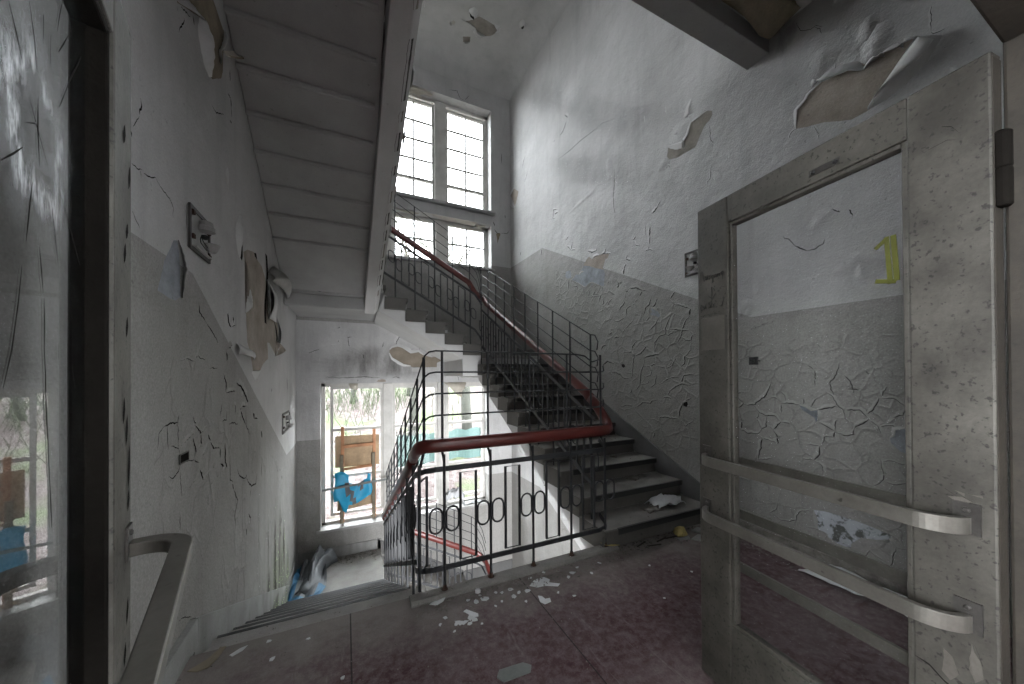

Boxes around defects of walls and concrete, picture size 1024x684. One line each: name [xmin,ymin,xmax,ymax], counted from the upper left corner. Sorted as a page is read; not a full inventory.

peeling [177,0,228,79]
peeling [450,7,501,44]
peeling [793,37,914,129]
peeling [667,99,712,159]
peeling [158,240,189,301]
peeling [236,215,292,380]
crack [552,202,695,390]
peeling [389,344,441,373]
crack [158,376,262,535]
crack [738,366,906,486]
peeling [813,510,897,549]